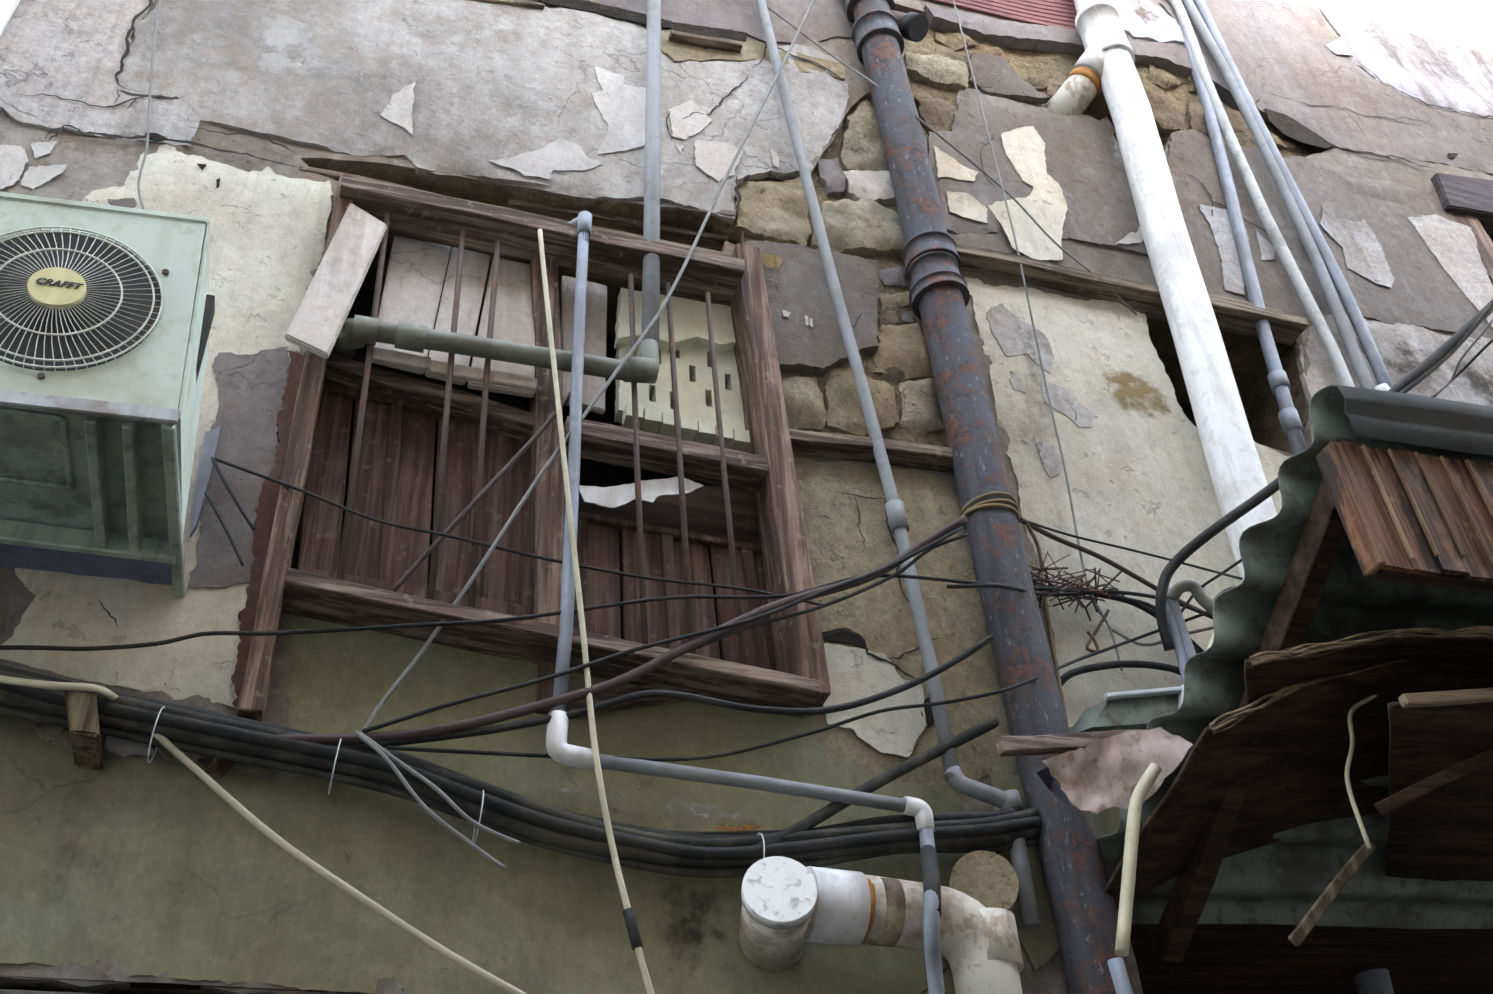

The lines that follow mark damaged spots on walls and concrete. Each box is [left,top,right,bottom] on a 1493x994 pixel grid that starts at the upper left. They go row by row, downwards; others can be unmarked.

spalling [538,0,748,49]
peeling [0,141,69,190]
crack [0,0,298,168]
peeling [903,31,1068,261]
flaking render [1144,65,1210,138]
flaking render [303,66,945,437]
peeling [1199,204,1276,295]
peeling [1320,201,1395,288]
peeling [1407,214,1493,328]
leakage [1106,372,1169,417]
flaking render [188,347,305,709]
peeling [822,628,934,757]